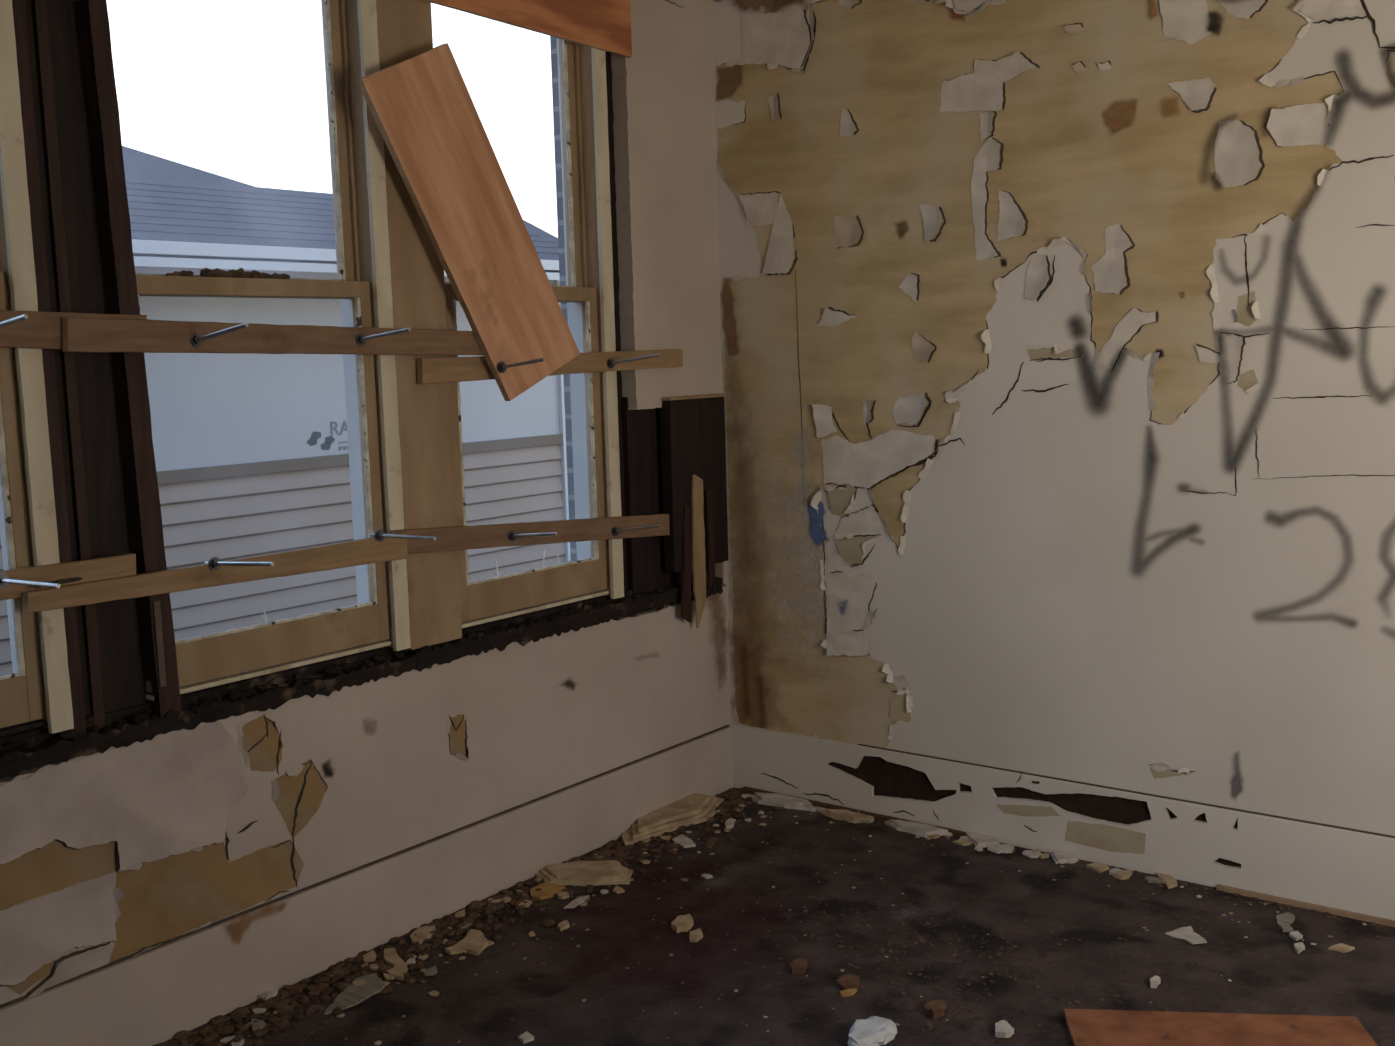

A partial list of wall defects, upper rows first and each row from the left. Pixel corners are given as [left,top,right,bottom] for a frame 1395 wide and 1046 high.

peeling [716,0,1366,749]
peeling [0,716,328,999]
peeling [446,714,469,761]